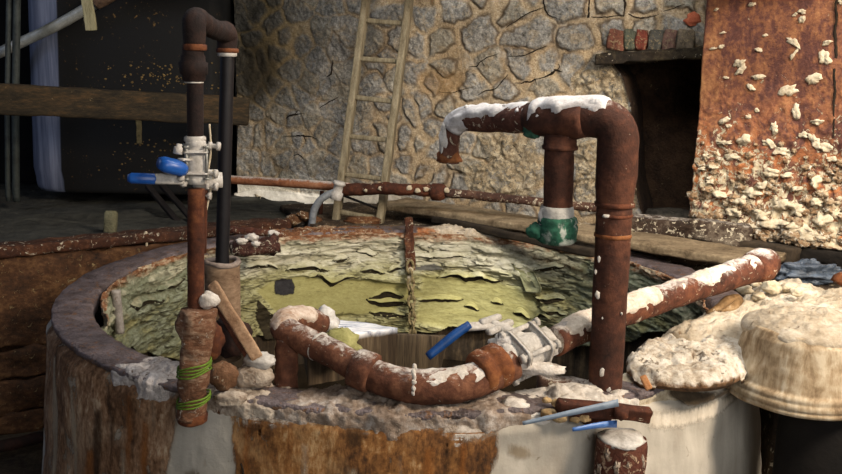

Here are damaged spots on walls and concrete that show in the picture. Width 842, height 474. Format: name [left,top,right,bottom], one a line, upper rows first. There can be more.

crack [506,0,556,28]
crack [439,46,562,95]
corrosion [685,0,842,250]
spalling [255,300,274,339]
peeling [244,248,404,287]
peeling [366,287,479,318]
peeling [415,251,471,259]
peeling [436,269,503,283]
peeling [511,261,569,321]
damp [111,356,179,402]
corrosion [232,416,498,474]